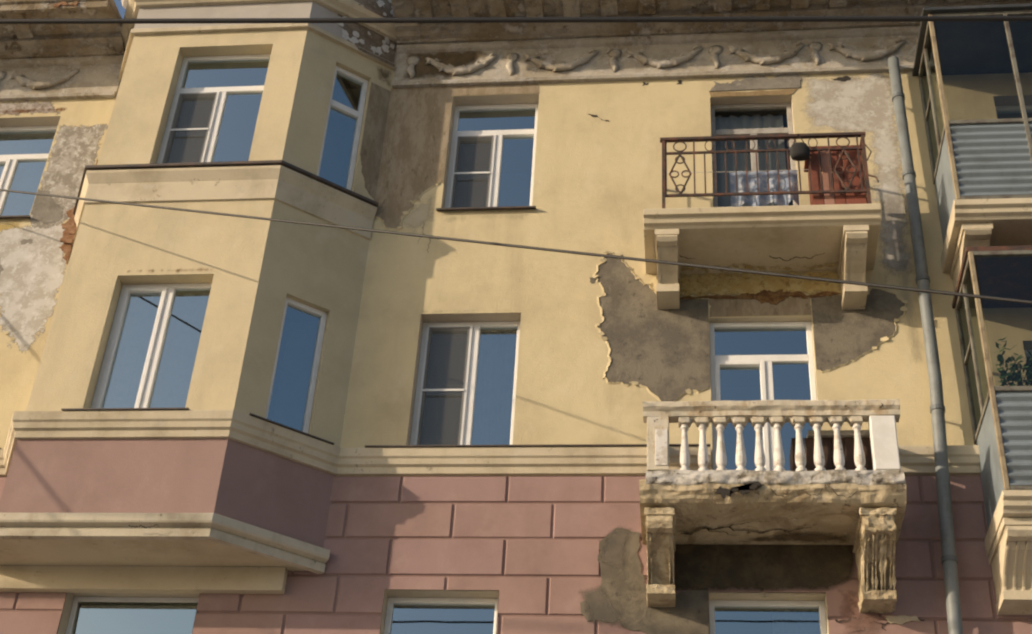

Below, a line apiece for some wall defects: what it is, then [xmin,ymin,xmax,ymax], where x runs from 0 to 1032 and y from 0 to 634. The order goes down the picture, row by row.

peeling [355,0,395,18]
peeling [337,14,539,232]
peeling [0,101,108,353]
peeling [590,251,908,401]
spalling [714,482,762,498]
crack [770,487,869,498]
crack [681,521,831,536]
water stain [675,544,855,591]